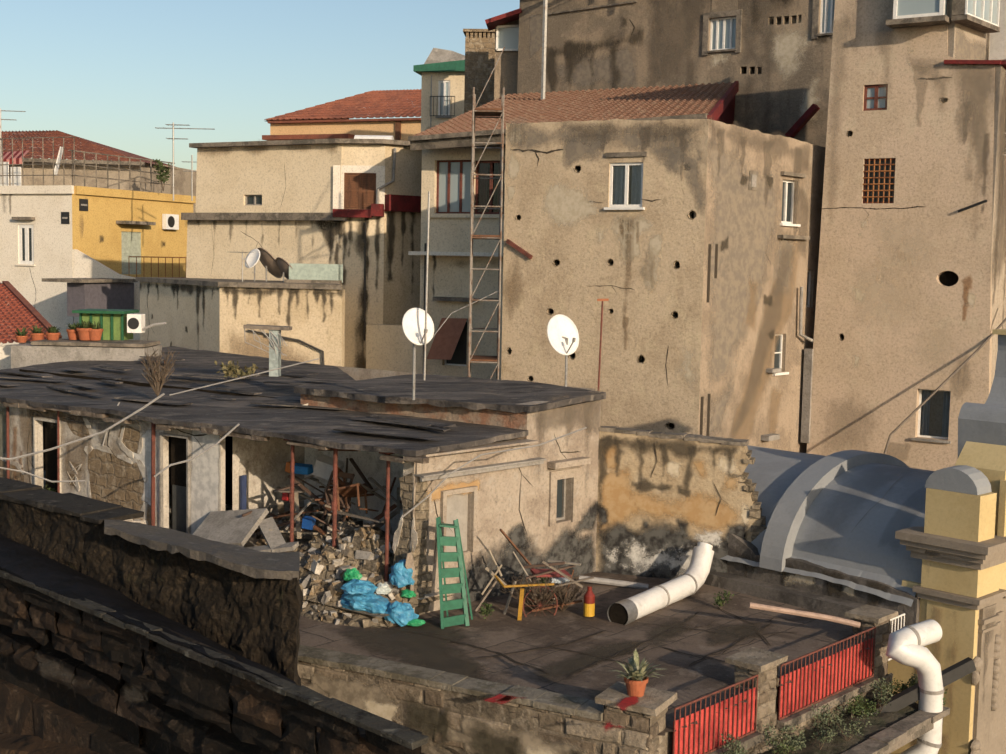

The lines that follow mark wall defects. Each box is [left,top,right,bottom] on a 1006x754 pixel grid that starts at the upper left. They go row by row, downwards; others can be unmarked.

crack [510,149,563,166]
water stain [140,211,415,369]
rust [963,277,971,320]
spalling [24,408,159,526]
crack [519,468,531,533]
peeling [597,445,767,541]
water stain [453,497,748,603]
crack [378,606,792,678]